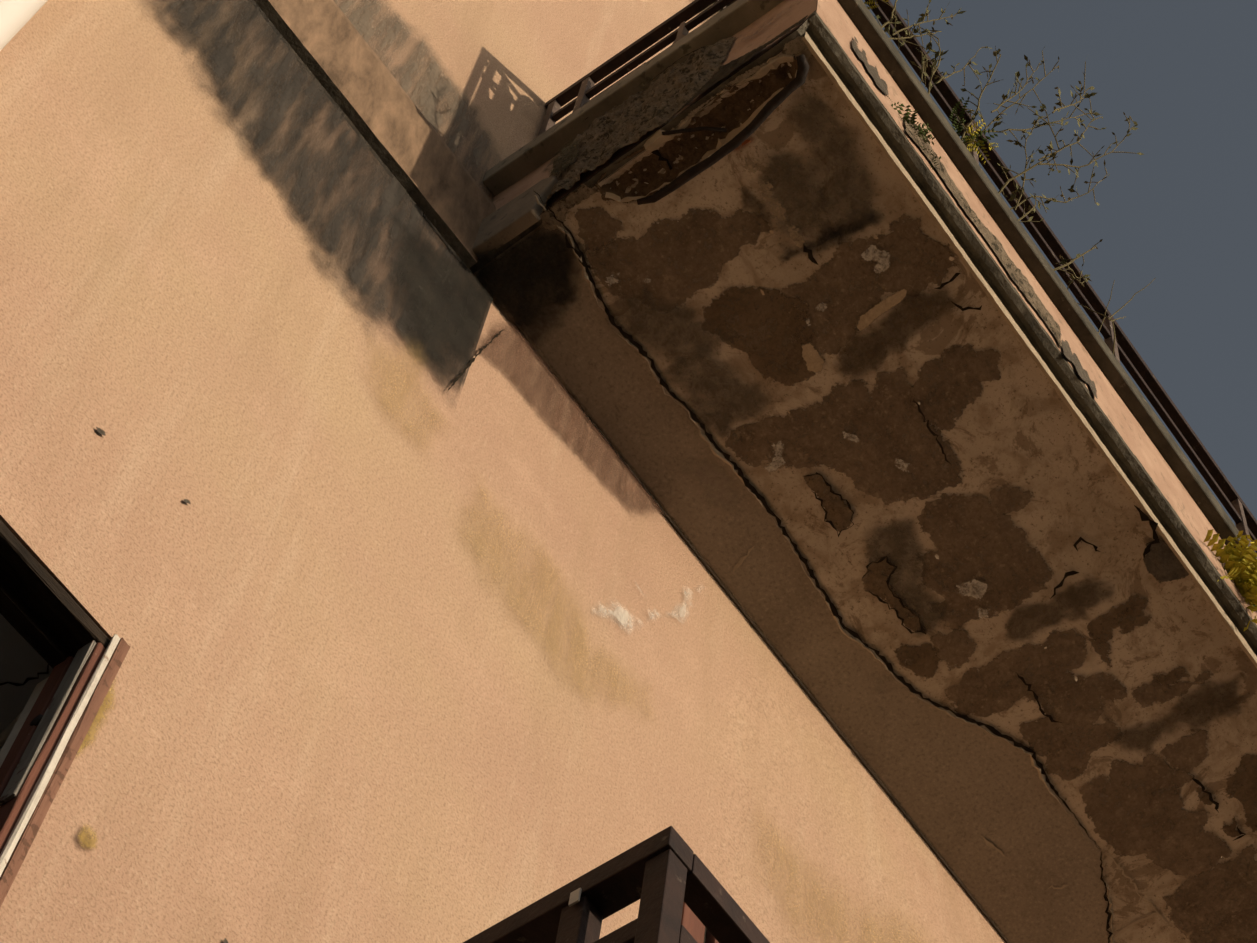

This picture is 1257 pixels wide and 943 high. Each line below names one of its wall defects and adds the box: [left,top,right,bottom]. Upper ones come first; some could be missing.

leakage [159,0,577,386]
flaking render [480,10,957,386]
spalling [905,118,1098,399]
crack [534,191,1173,943]
flaking render [725,343,1257,943]
peeling [568,888,582,907]